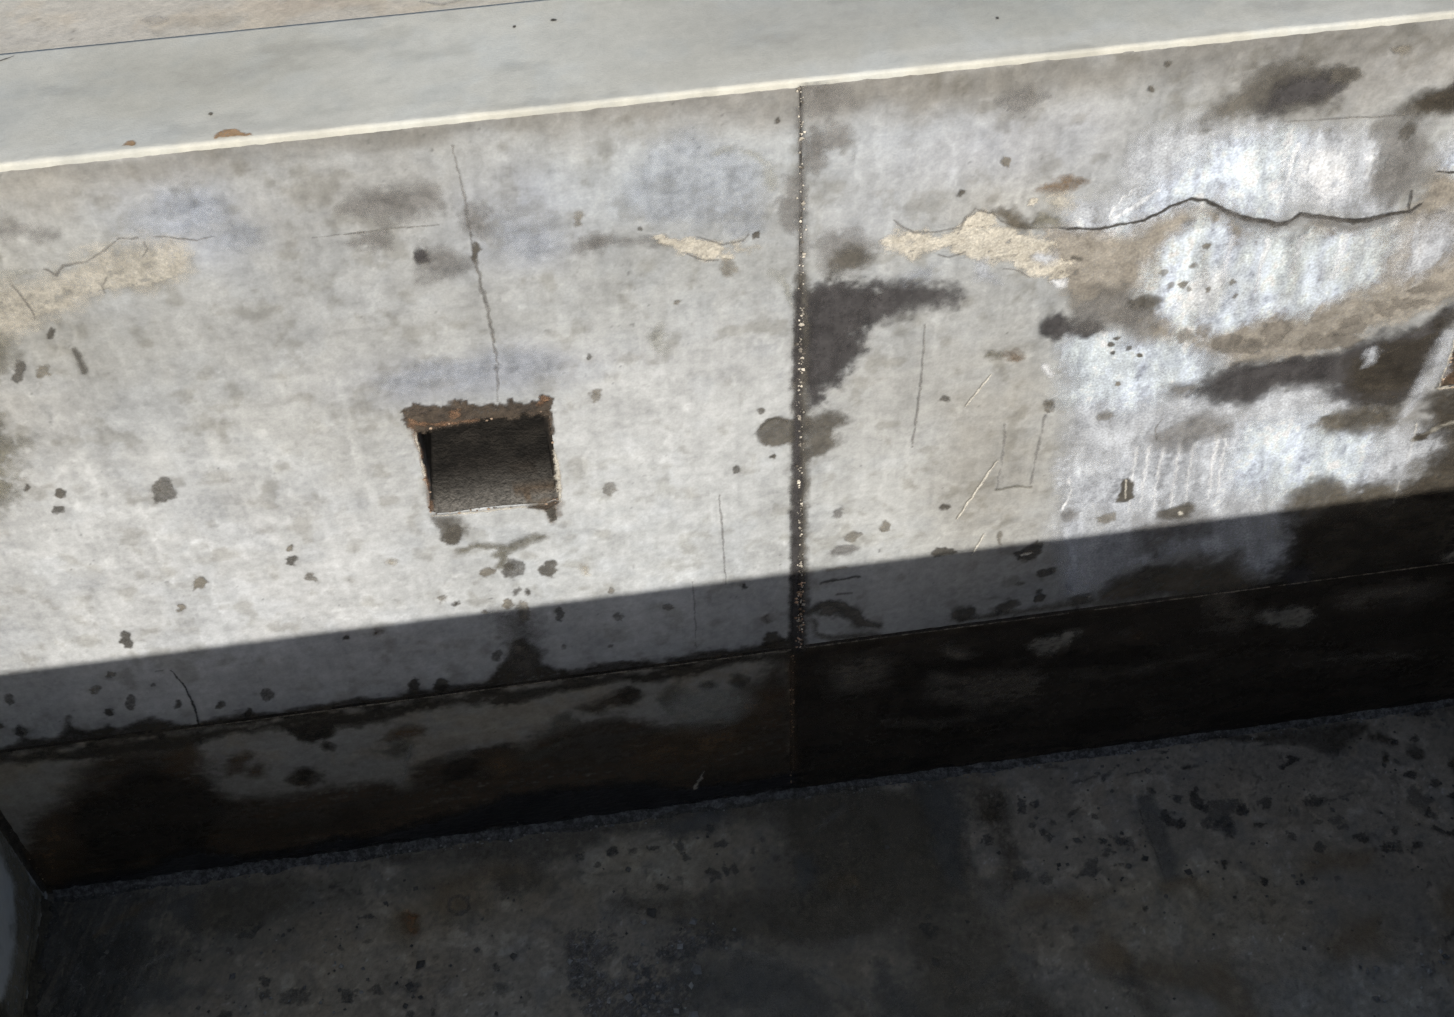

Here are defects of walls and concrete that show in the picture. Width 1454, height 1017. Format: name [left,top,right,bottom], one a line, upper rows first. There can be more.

leakage [1213,60,1361,118]
spalling [656,235,748,261]
peeling [883,174,1454,362]
crack [897,171,1454,261]
leakage [0,86,1454,890]
leakage [0,831,45,1017]